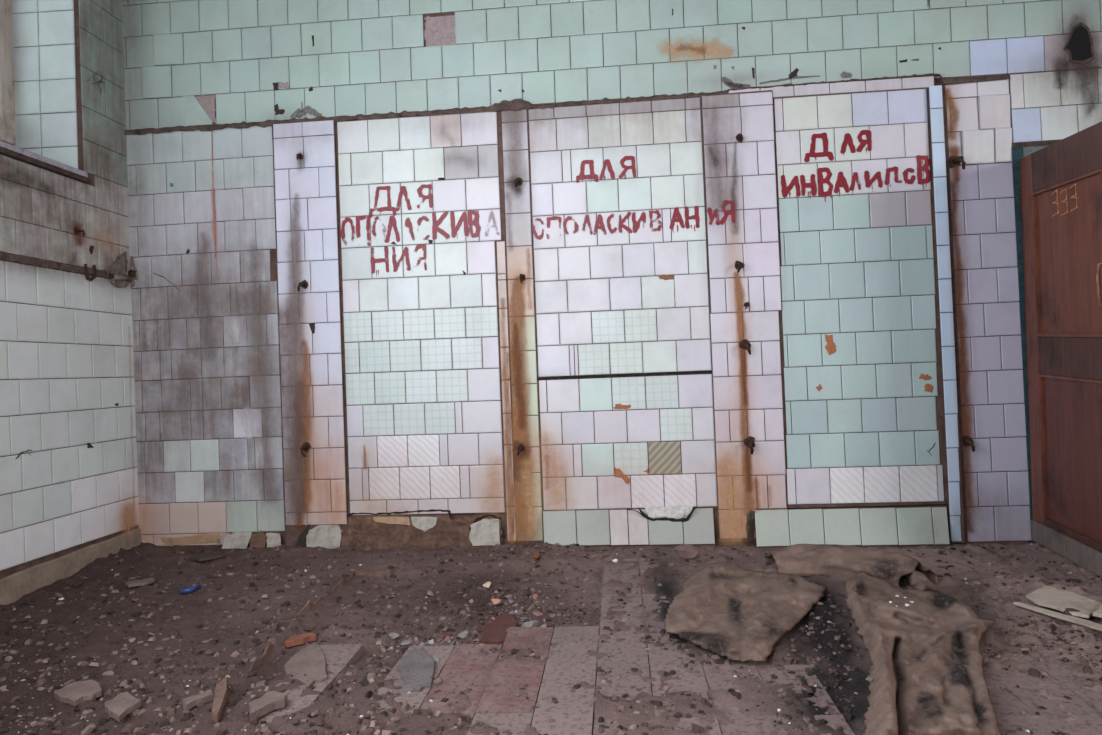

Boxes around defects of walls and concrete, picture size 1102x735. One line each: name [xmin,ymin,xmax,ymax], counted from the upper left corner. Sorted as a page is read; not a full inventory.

spalling [195,95,216,123]
spalling [424,15,456,47]
corrosion [665,43,731,58]
corrosion [295,342,310,526]
corrosion [502,278,535,543]
corrosion [724,273,759,540]